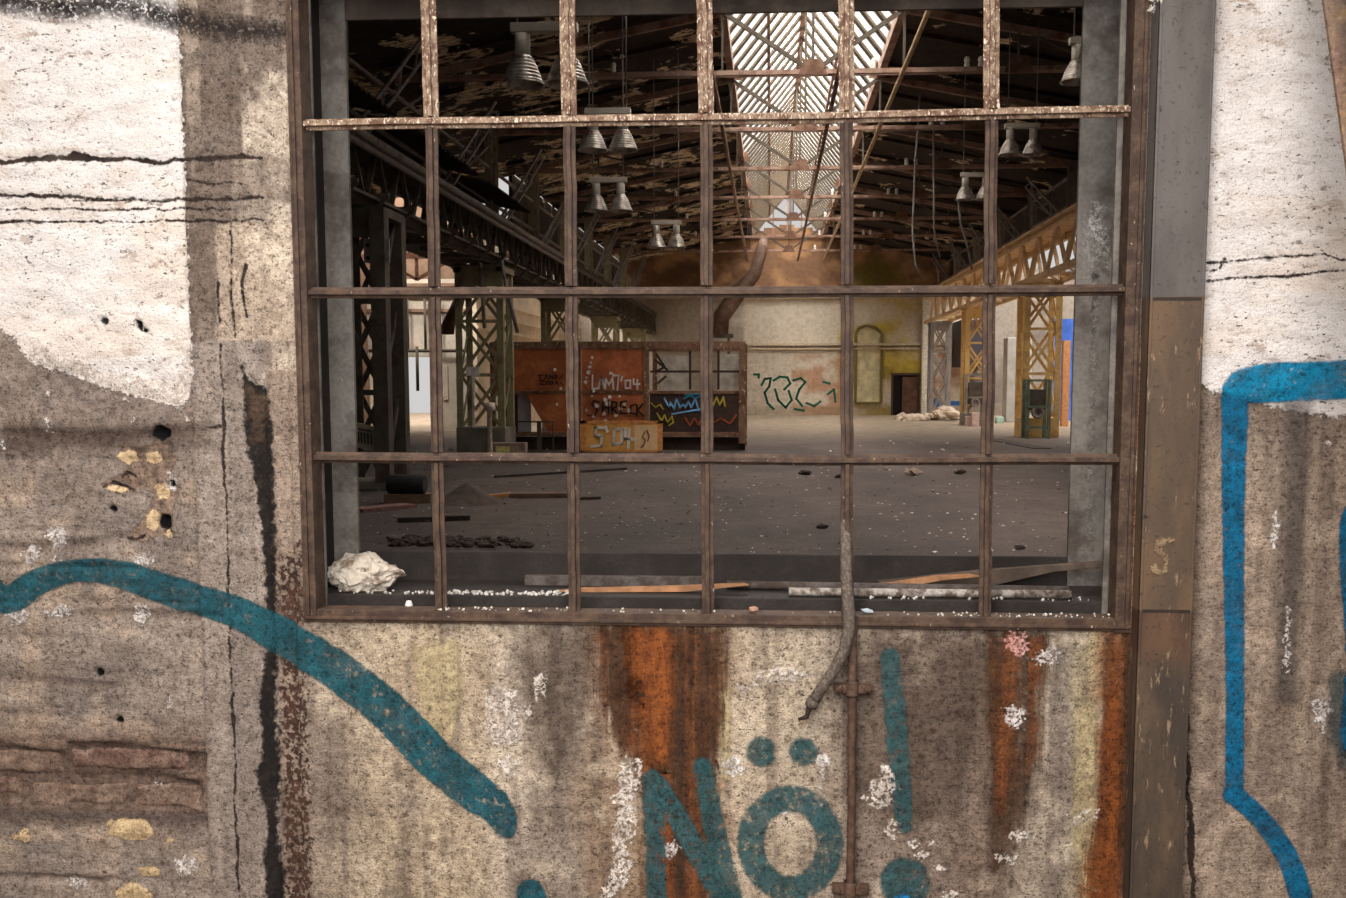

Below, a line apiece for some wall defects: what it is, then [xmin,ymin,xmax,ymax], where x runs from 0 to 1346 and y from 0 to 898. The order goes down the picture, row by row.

spalling [0,741,207,843]
peeling [27,346,193,422]
crack [0,150,264,897]
spalling [101,425,179,541]
leakage [240,364,286,898]
rust [281,539,315,898]
rust [599,625,726,898]
rust [986,630,1046,872]
rust [1077,635,1131,898]
crack [1206,253,1345,282]